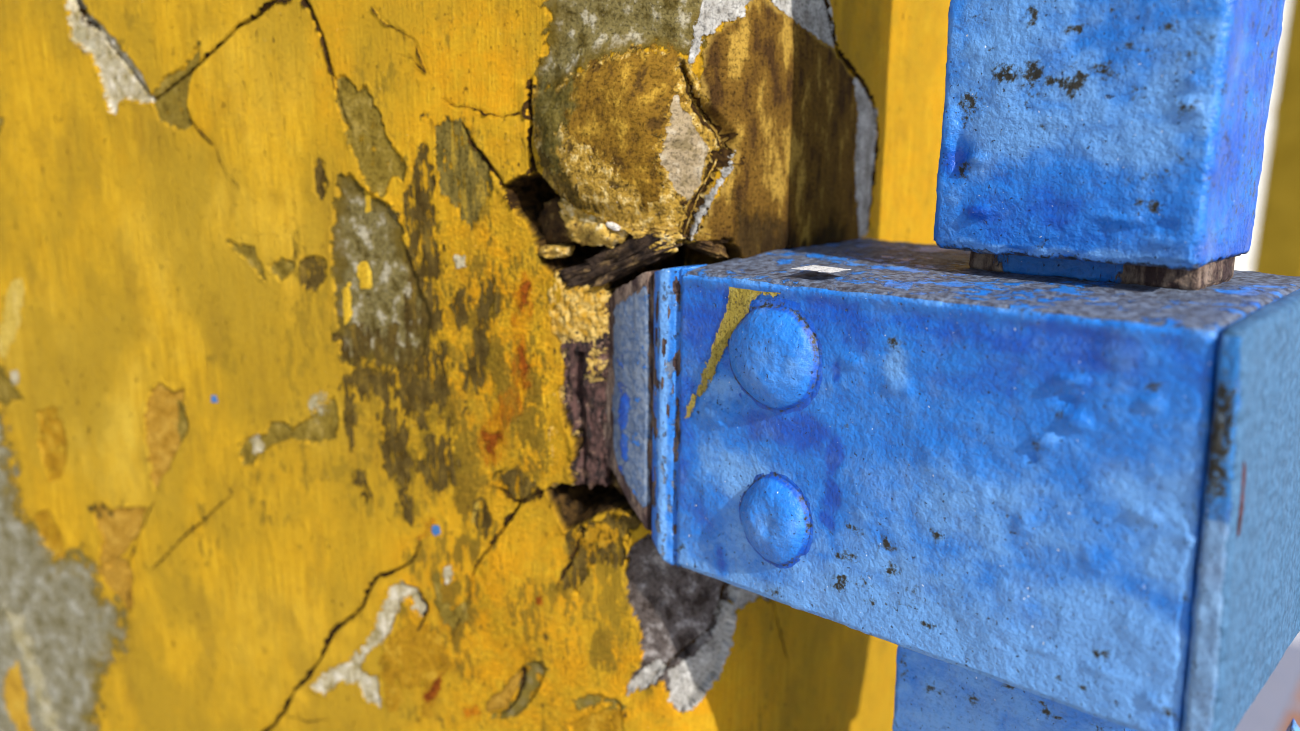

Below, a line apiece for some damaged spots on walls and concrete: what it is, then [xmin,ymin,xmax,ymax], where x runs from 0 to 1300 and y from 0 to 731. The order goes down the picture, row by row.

flaking render [65,0,201,130]
crack [154,0,350,128]
crack [371,7,426,73]
flaking render [531,0,723,244]
water stain [331,113,504,526]
flaking render [0,278,147,731]
crack [127,490,233,615]
peeling [239,394,339,467]
flaking render [310,565,469,724]
crack [262,467,544,731]
crack [556,485,605,592]
flaking render [560,505,769,731]